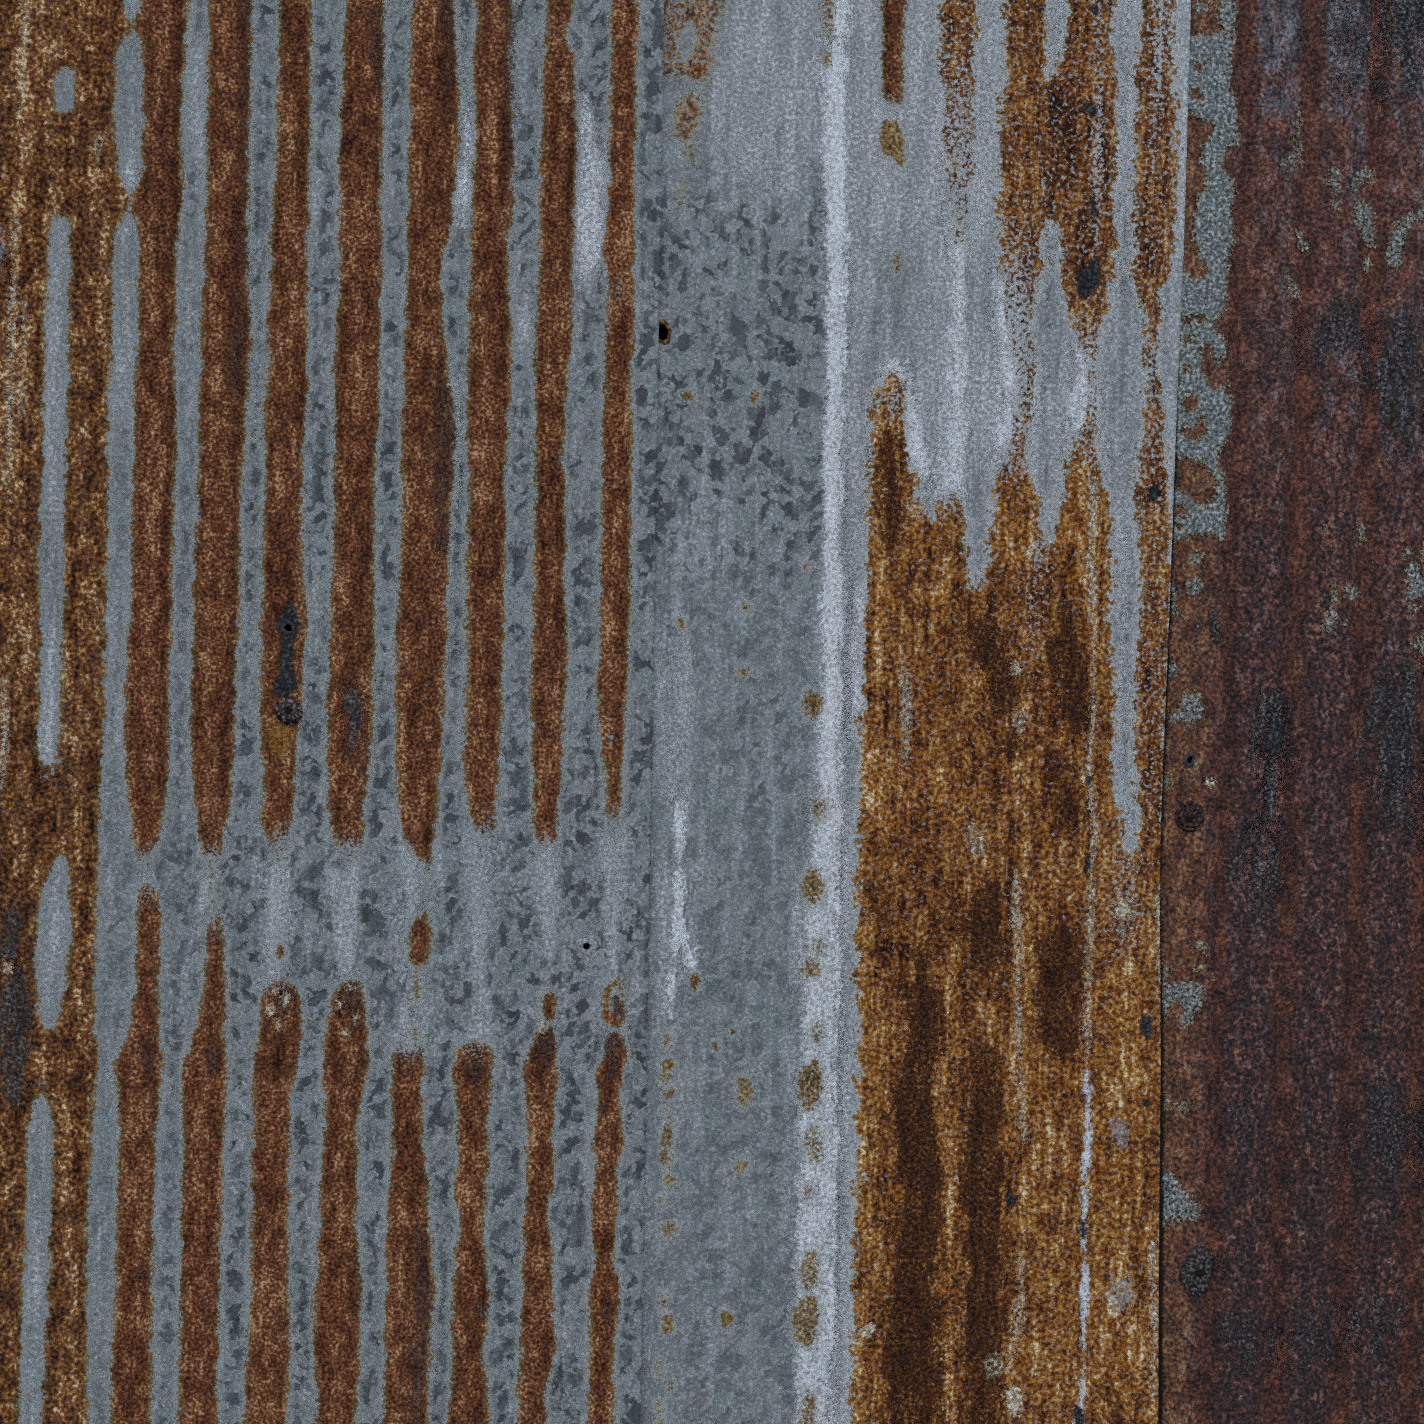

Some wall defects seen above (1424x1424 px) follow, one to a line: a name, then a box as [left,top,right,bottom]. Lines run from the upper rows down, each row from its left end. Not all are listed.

corrosion [663,0,727,164]
peeling [1171,0,1242,619]
corrosion [591,0,644,844]
corrosion [0,0,583,1424]
corrosion [799,684,827,721]
corrosion [838,0,1187,1424]
peeling [1167,660,1205,724]
corrosion [797,863,827,908]
corrosion [582,973,632,1424]
corrosion [657,1028,682,1240]
corrosion [786,1248,823,1352]
corrosion [794,1022,827,1164]